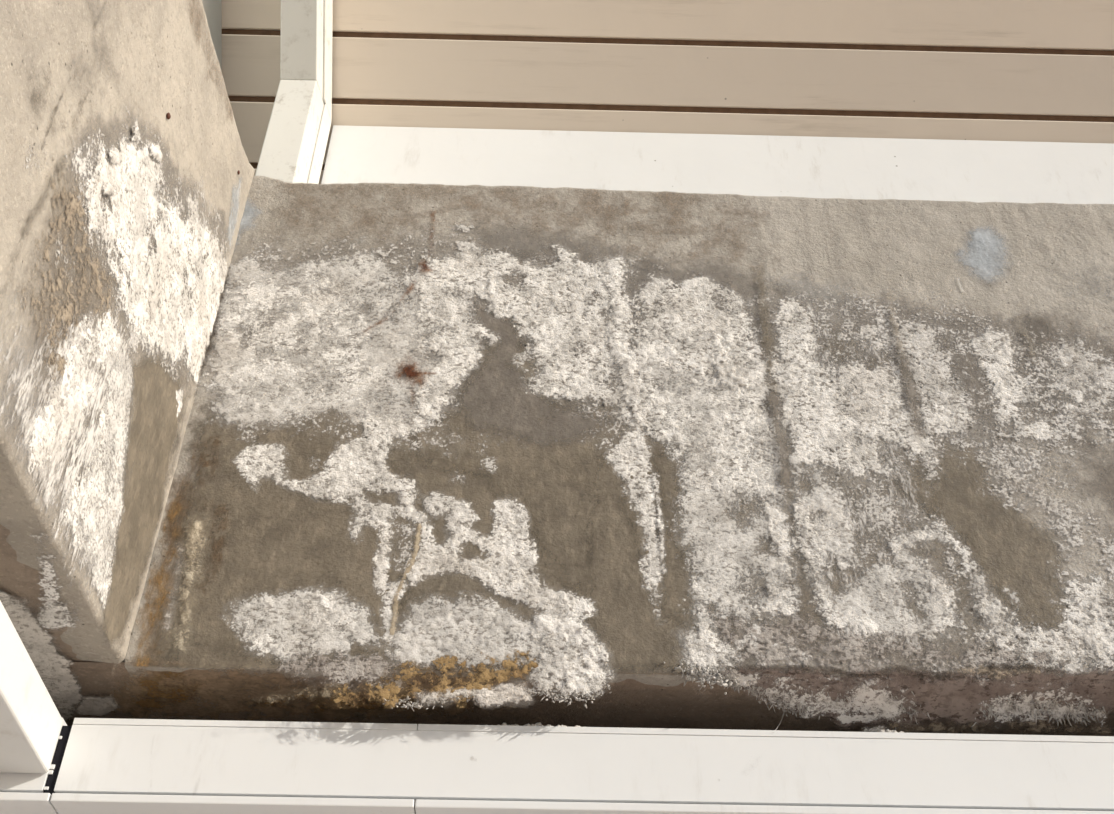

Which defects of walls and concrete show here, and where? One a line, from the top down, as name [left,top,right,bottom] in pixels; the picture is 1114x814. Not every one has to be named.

corrosion [396,363,436,395]
water stain [0,110,1114,711]
corrosion [110,481,511,723]